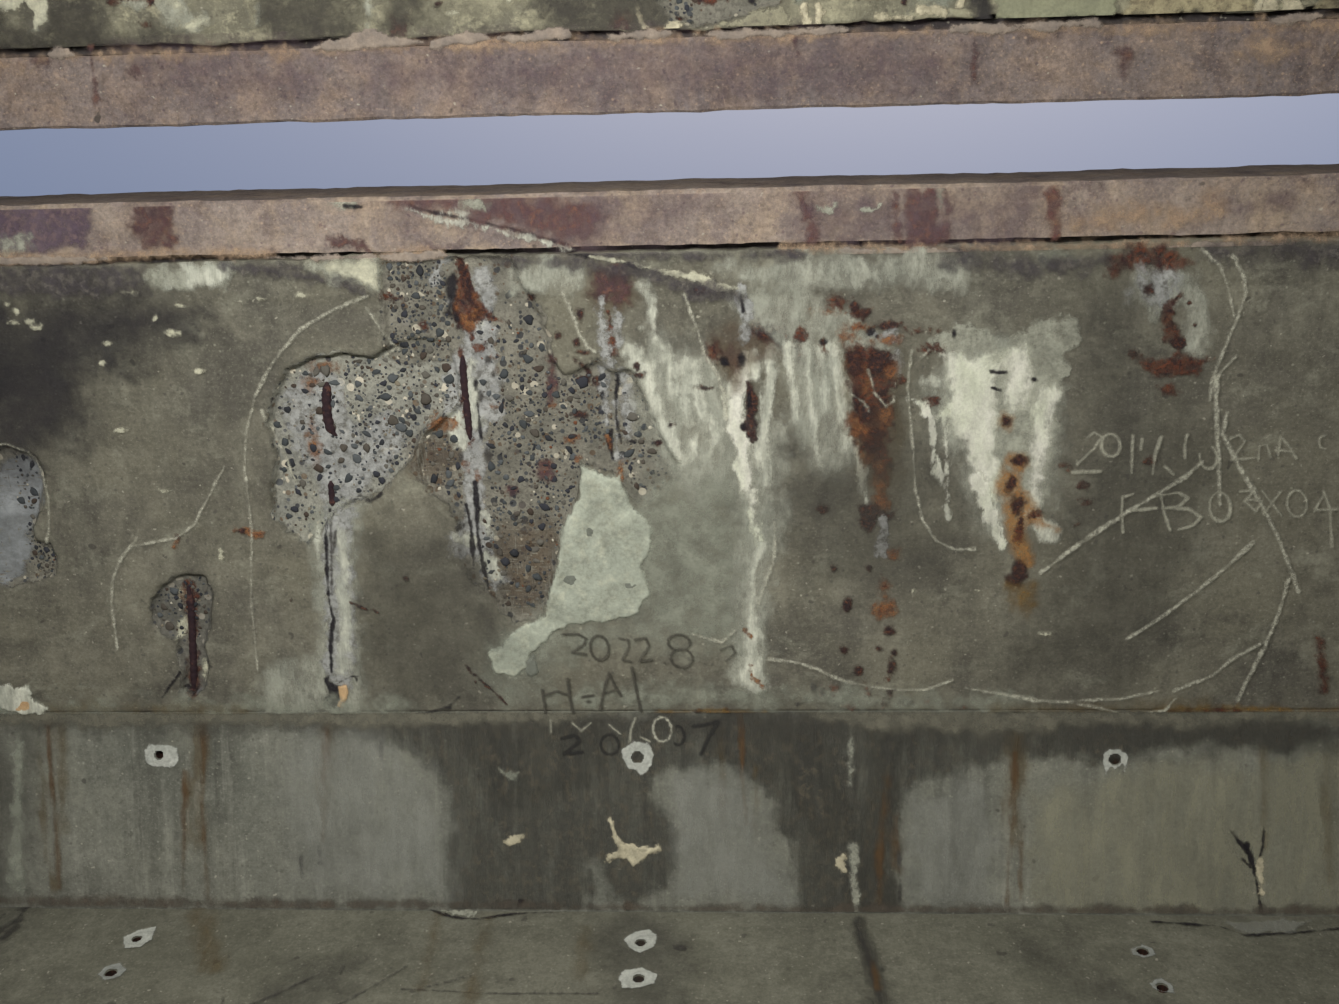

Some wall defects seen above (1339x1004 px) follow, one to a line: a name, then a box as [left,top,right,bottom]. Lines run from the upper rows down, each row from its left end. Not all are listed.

spalling [657,0,826,29]
peeling [994,0,1255,18]
spalling [0,443,58,588]
corrosion [446,257,498,352]
spalling [263,254,751,699]
corrosion [706,316,809,443]
corrosion [827,294,945,572]
corrosion [997,454,1044,606]
corrosion [1107,240,1210,395]
spalling [150,574,214,702]
leakage [0,247,1339,1004]
crack [1151,831,1339,936]